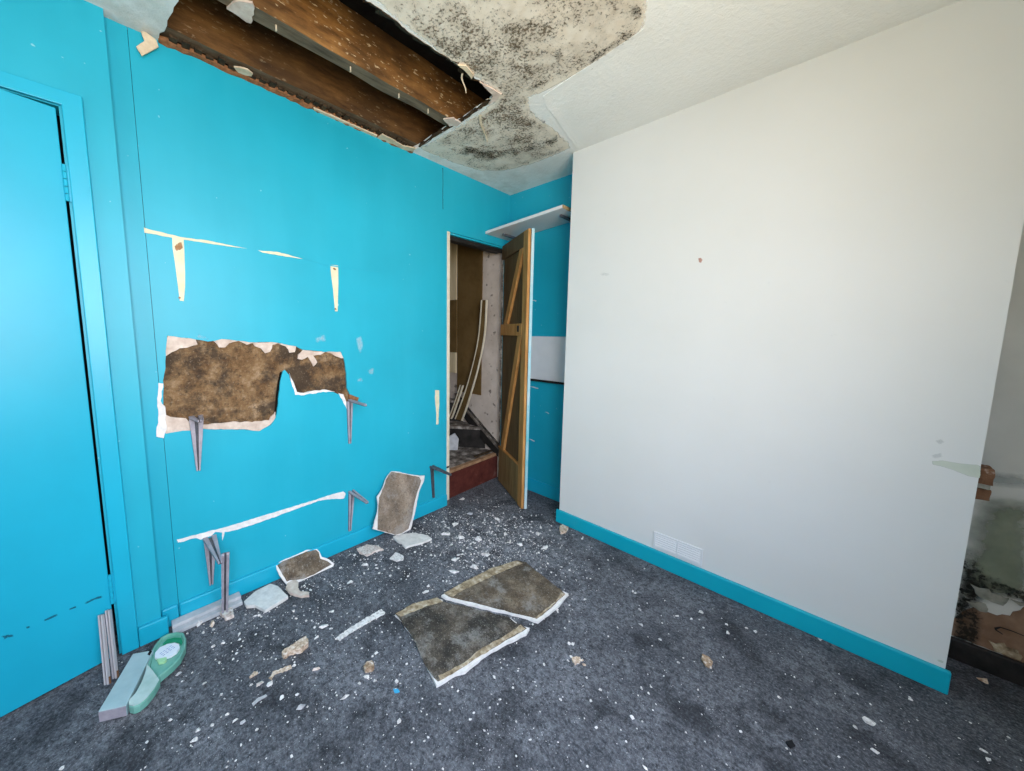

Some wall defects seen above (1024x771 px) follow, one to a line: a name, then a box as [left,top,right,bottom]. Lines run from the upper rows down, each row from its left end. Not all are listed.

peeling [227,0,254,23]
flaking render [136,31,416,153]
peeling [458,64,502,105]
leakage [399,0,641,170]
peeling [443,117,461,126]
peeling [144,228,242,248]
peeling [259,250,379,272]
flaking render [156,336,359,438]
peeling [177,492,346,542]
leakage [954,506,1024,644]